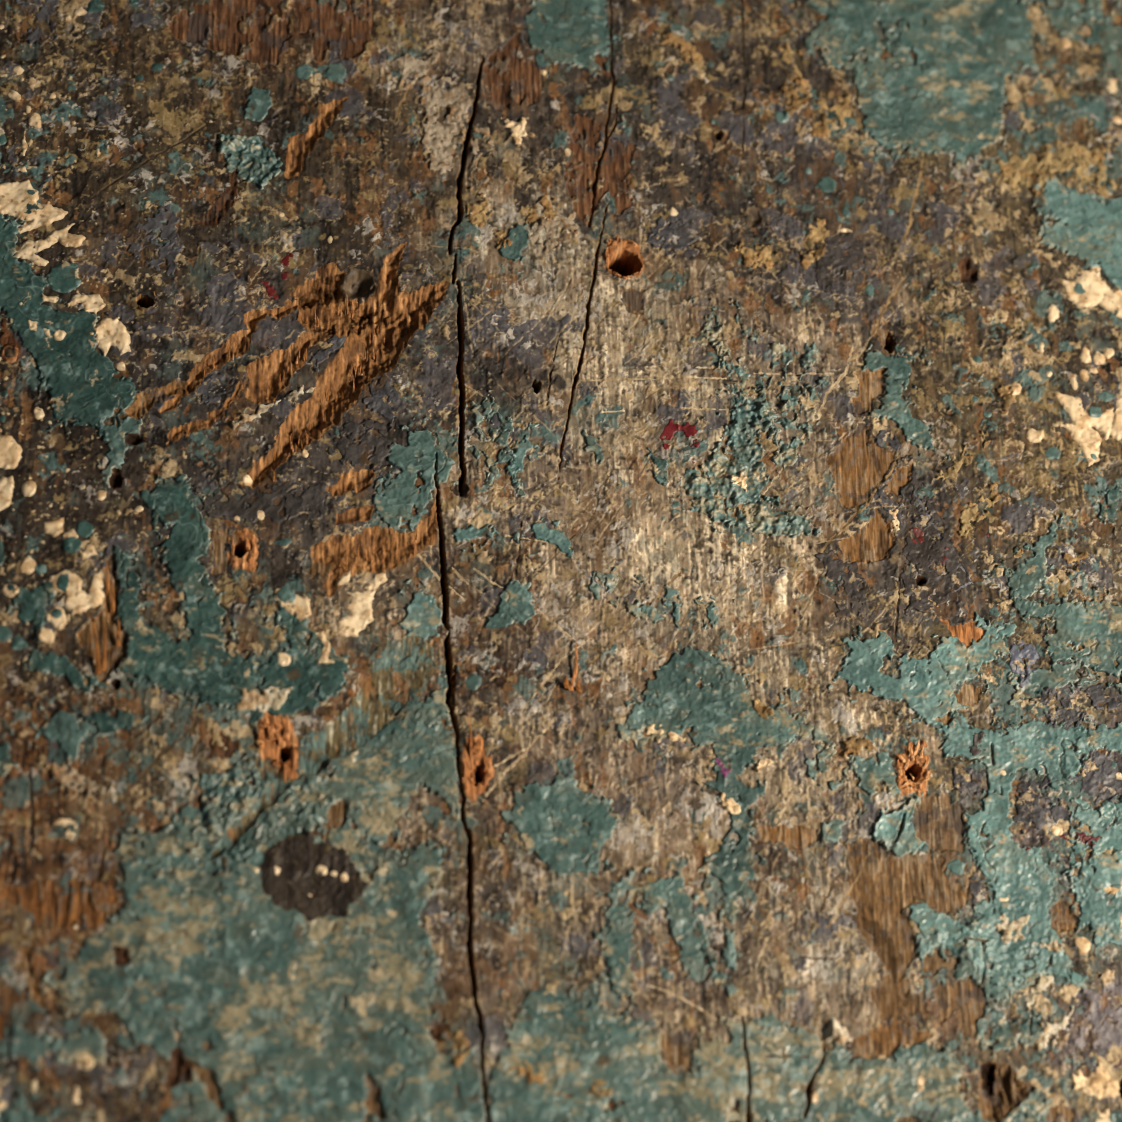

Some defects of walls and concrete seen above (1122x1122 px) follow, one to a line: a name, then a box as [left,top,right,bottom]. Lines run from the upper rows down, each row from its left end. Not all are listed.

peeling [128,0,377,69]
peeling [0,204,500,1122]
crack [434,56,490,1122]
peeling [463,390,546,498]
crack [546,0,618,480]
peeling [621,287,646,315]
peeling [646,216,699,258]
peeling [647,298,827,539]
peeling [815,232,868,295]
peeling [815,327,962,622]
spalling [958,257,978,284]
peeling [485,512,1122,1122]